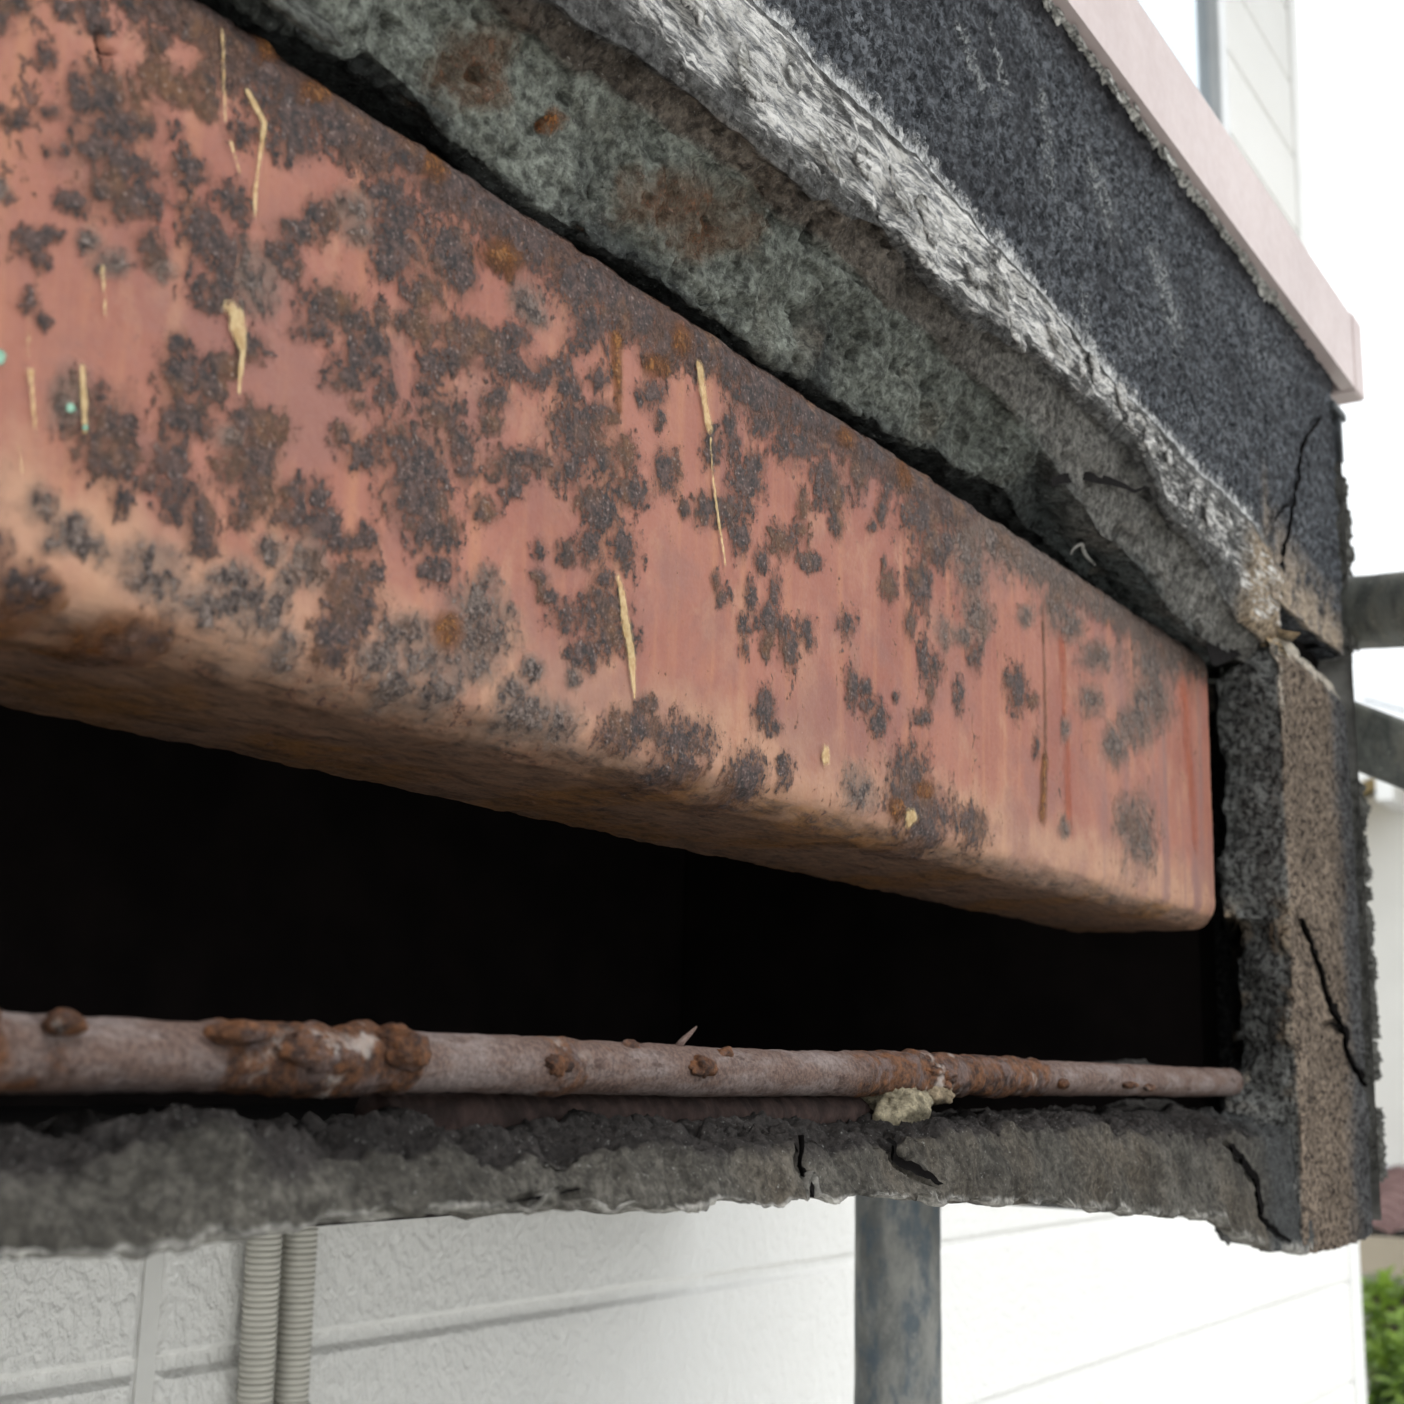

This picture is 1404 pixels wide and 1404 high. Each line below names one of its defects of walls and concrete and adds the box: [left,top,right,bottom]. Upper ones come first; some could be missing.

rust [0,0,1207,891]
crack [1274,416,1321,596]
peeling [1334,431,1356,589]
peeling [906,810,916,827]
crack [1299,917,1368,1087]
peeling [1317,625,1389,1221]
crack [797,1135,815,1198]
crack [886,1138,943,1186]